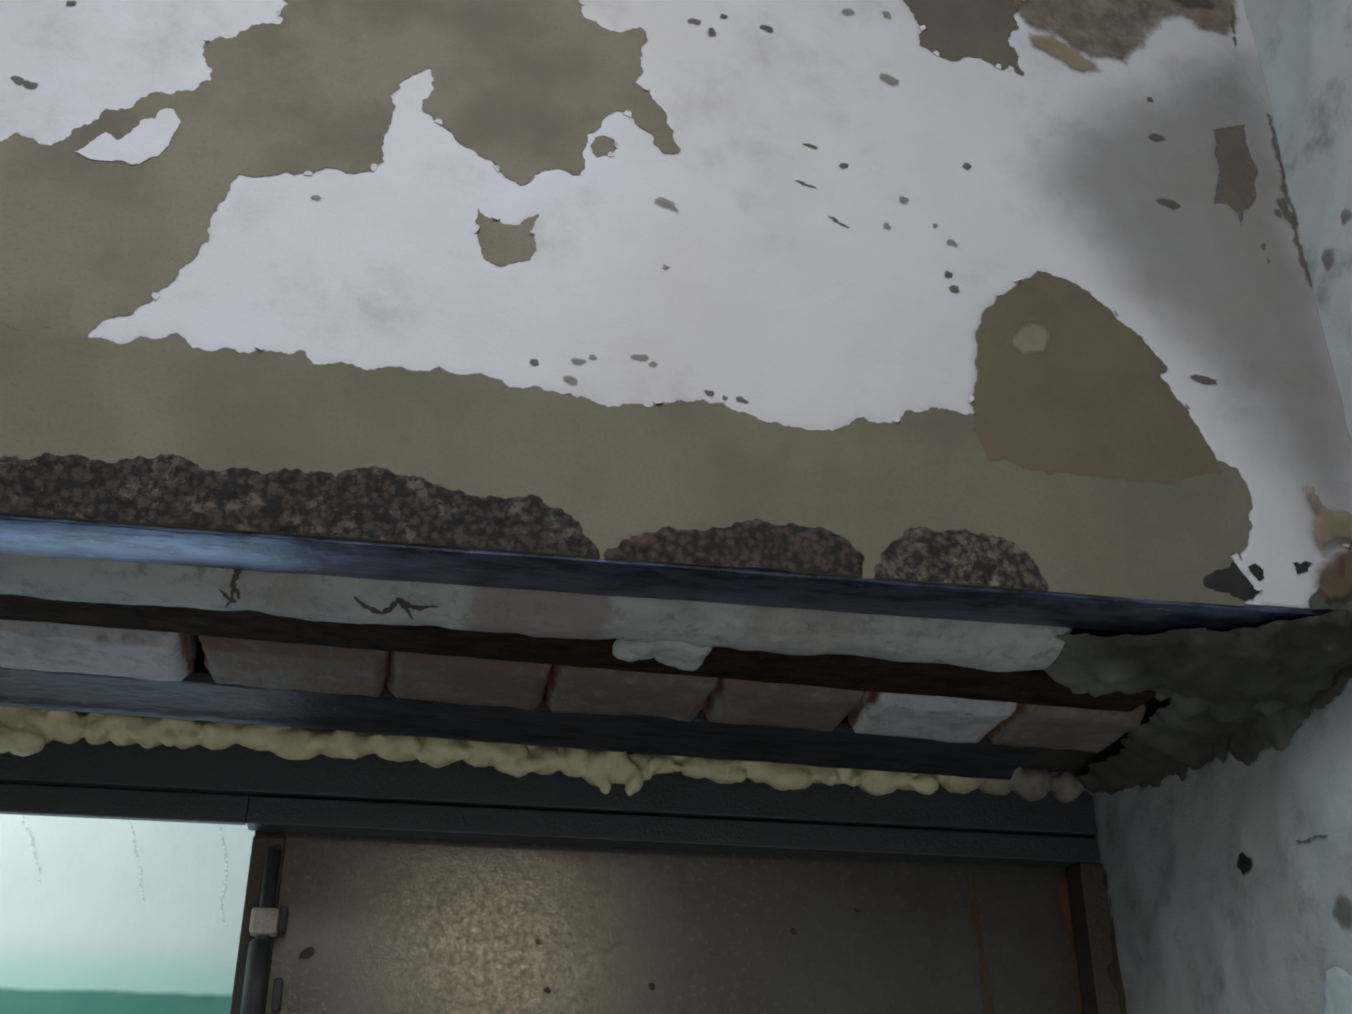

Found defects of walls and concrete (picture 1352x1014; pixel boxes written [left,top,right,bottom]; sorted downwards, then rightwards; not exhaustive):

peeling [0,0,1264,606]
crack [219,569,241,607]
crack [354,597,439,620]